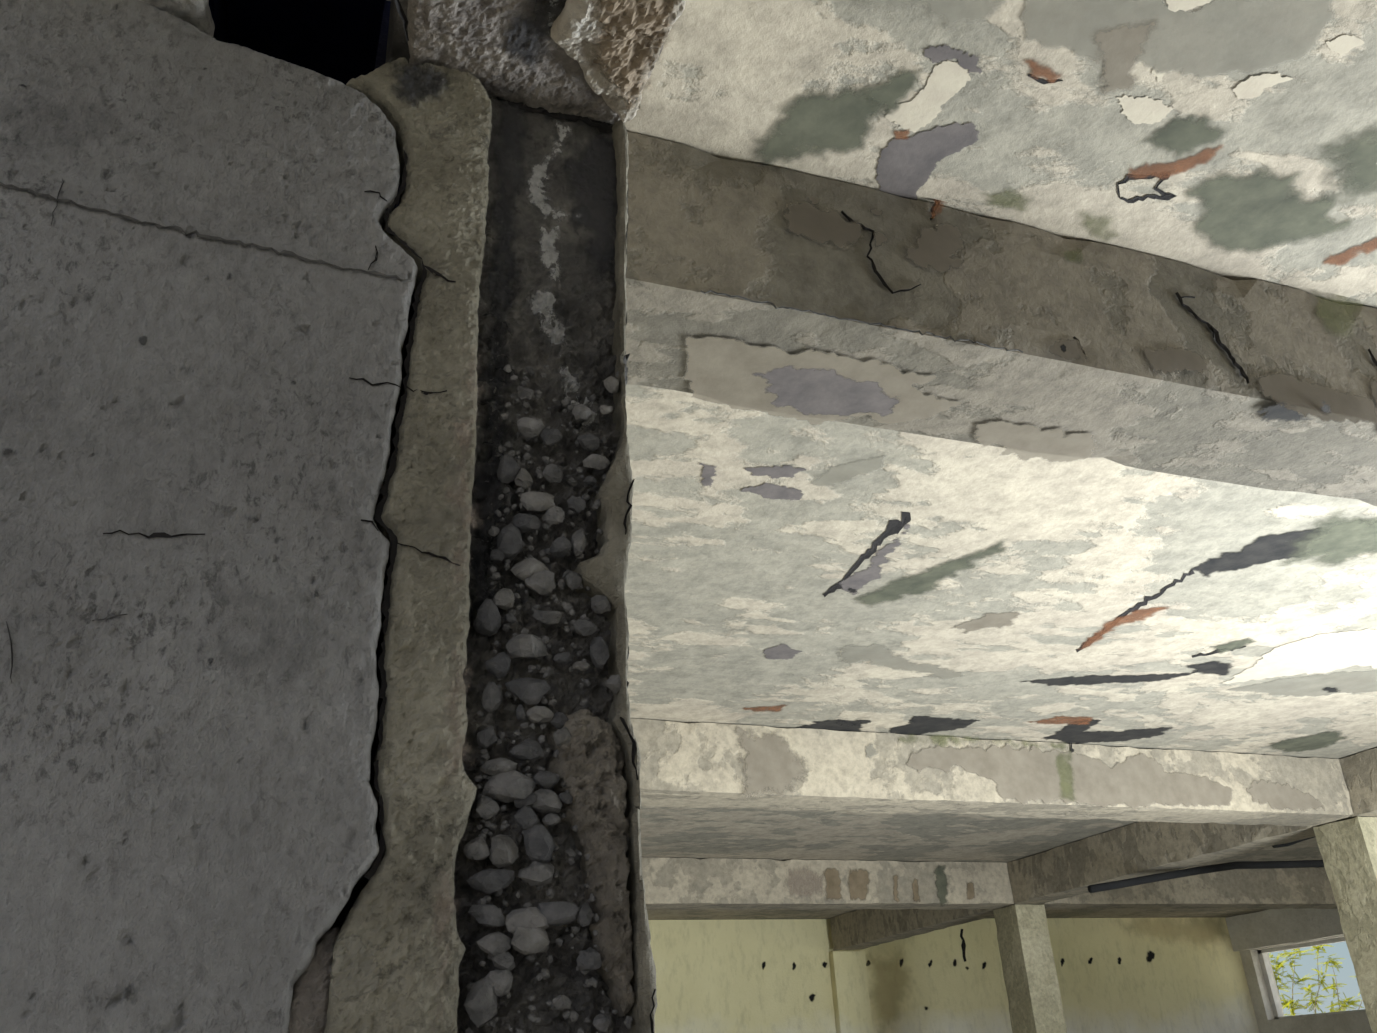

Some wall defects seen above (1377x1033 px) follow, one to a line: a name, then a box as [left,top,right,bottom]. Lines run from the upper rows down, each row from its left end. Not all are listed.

spalling [876,45,982,200]
peeling [1117,69,1174,124]
peeling [1233,73,1293,99]
rust [1117,146,1221,203]
rust [1324,238,1377,266]
crack [700,211,1023,353]
crack [1175,292,1249,384]
peeling [1259,372,1377,425]
peeling [741,456,885,501]
crack [0,151,460,880]
crack [1192,646,1246,658]
flaking render [464,376,621,1028]